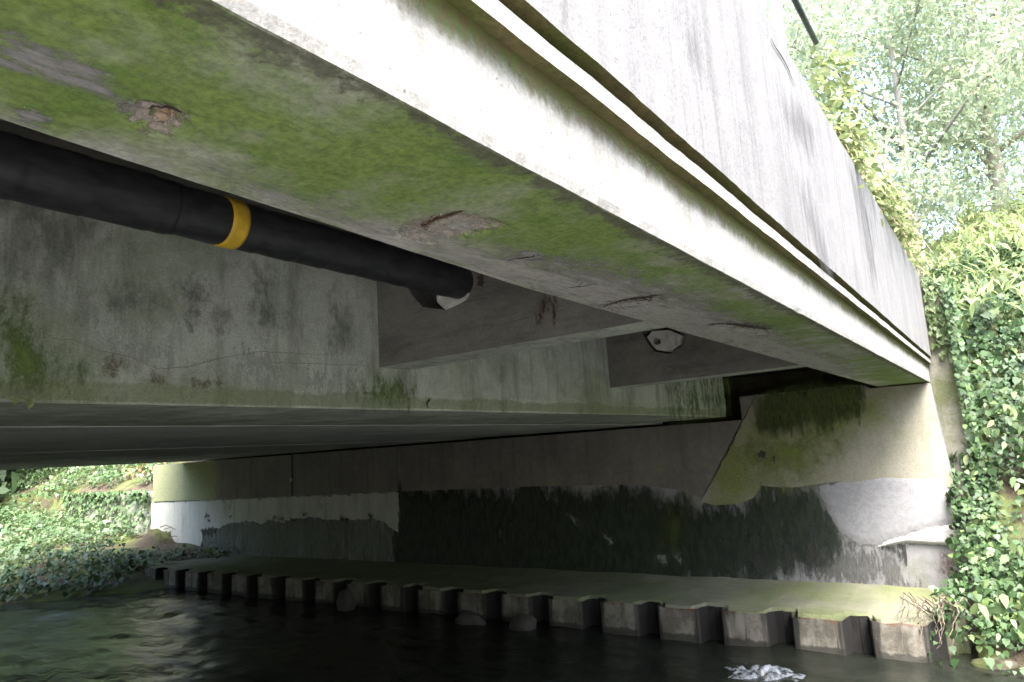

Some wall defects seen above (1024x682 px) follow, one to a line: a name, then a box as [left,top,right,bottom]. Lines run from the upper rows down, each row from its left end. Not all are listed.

spalling [119,100,190,136]
spalling [397,210,503,242]
water stain [201,483,922,587]